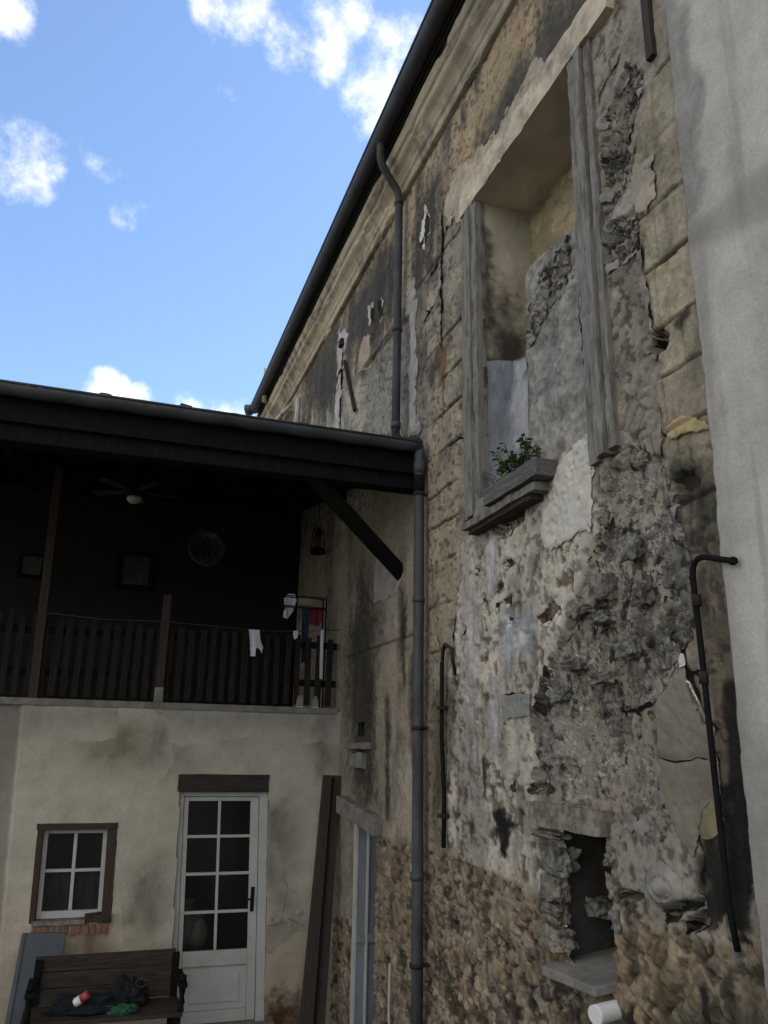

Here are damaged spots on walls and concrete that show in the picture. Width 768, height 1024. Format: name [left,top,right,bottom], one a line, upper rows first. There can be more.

flaking render [334,328,348,428]
flaking render [357,298,384,373]
flaking render [419,205,431,250]
crack [420,199,453,350]
flaking render [444,57,544,227]
spalling [510,234,573,451]
spalling [596,61,656,274]
spalling [507,434,695,843]
water stain [493,808,515,858]
spalling [563,830,647,958]
spalling [663,892,715,936]
water stain [697,681,754,934]